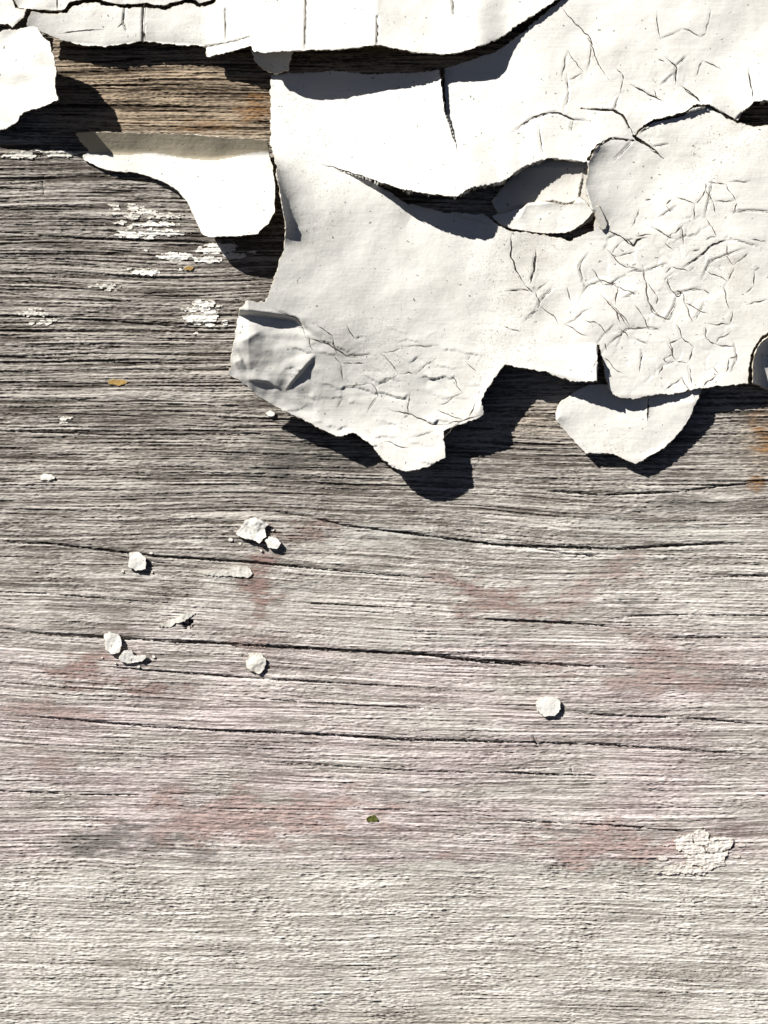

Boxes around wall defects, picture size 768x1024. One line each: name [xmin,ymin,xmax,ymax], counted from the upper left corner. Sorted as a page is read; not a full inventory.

crack [301,0,309,49]
crack [441,68,458,152]
crack [511,5,732,159]
crack [325,165,392,189]
peeling [0,0,768,472]
crack [504,180,767,394]
crack [280,312,482,448]
crack [279,512,725,557]
crack [3,628,613,668]